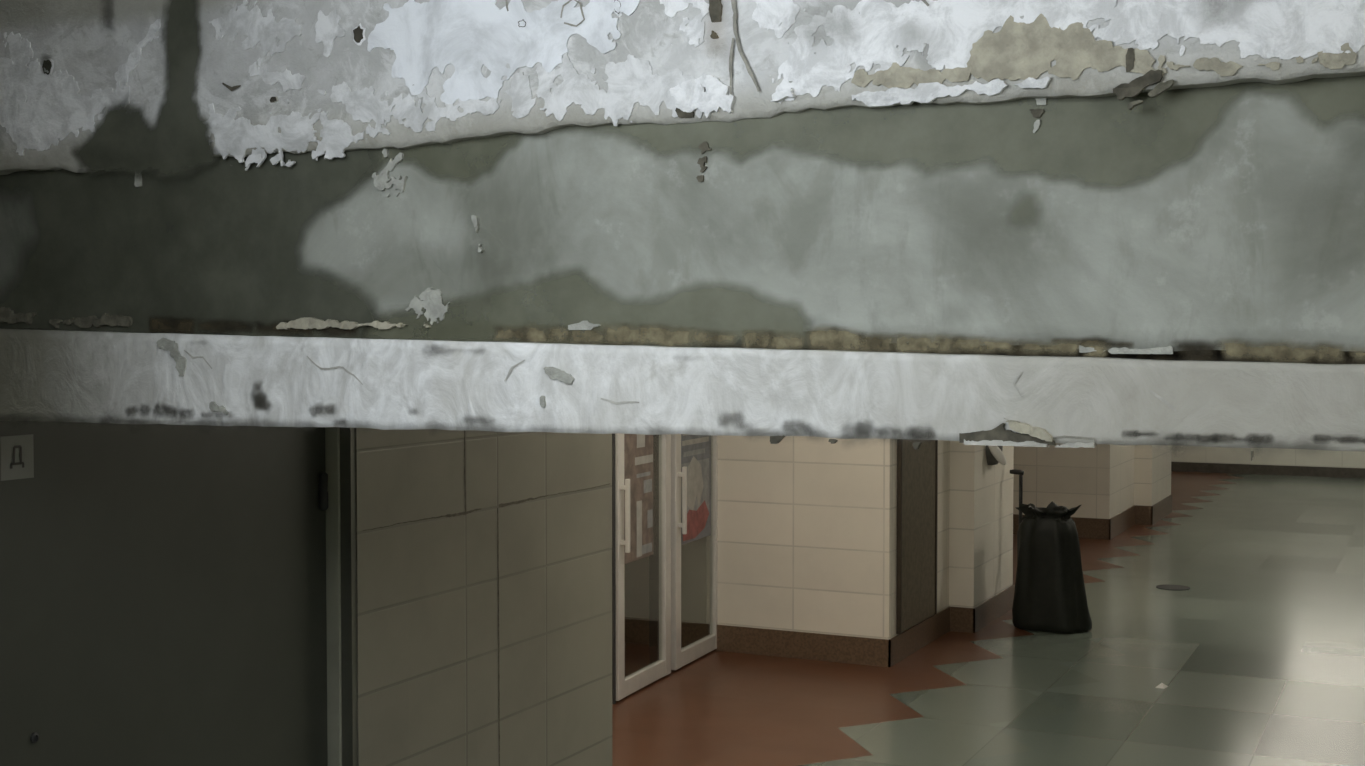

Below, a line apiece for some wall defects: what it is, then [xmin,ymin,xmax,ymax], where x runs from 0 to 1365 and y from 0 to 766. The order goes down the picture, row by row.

peeling [0,19,161,156]
damp [0,0,807,345]
peeling [205,0,735,171]
spalling [696,142,712,182]
crack [729,0,759,95]
damp [544,75,1365,187]
peeling [752,0,1365,133]
spalling [157,338,187,376]
spalling [276,317,431,329]
spalling [544,367,575,384]
spalling [1079,345,1173,354]